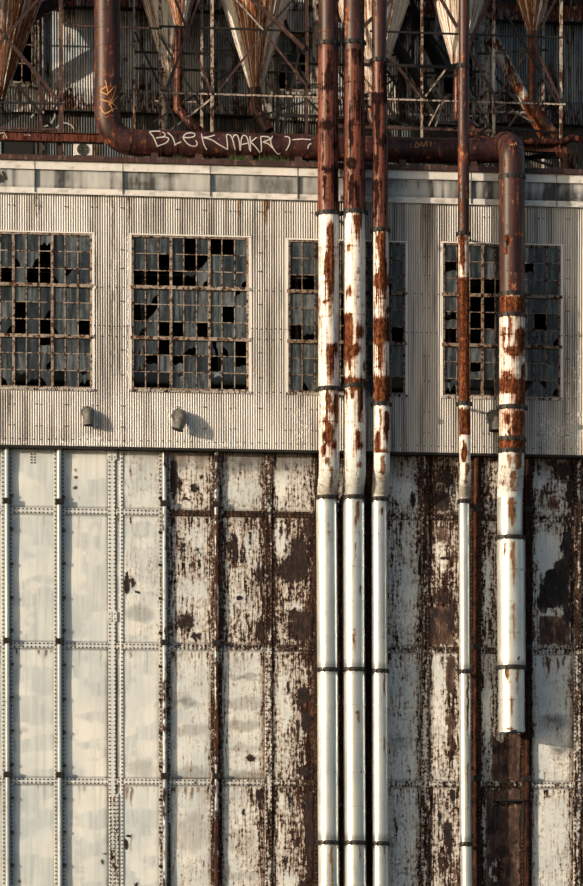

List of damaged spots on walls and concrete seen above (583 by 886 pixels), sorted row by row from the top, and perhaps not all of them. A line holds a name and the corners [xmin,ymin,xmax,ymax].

spalling [226,518,314,587]
spalling [537,531,572,646]
spalling [255,619,264,640]
spalling [280,607,317,644]